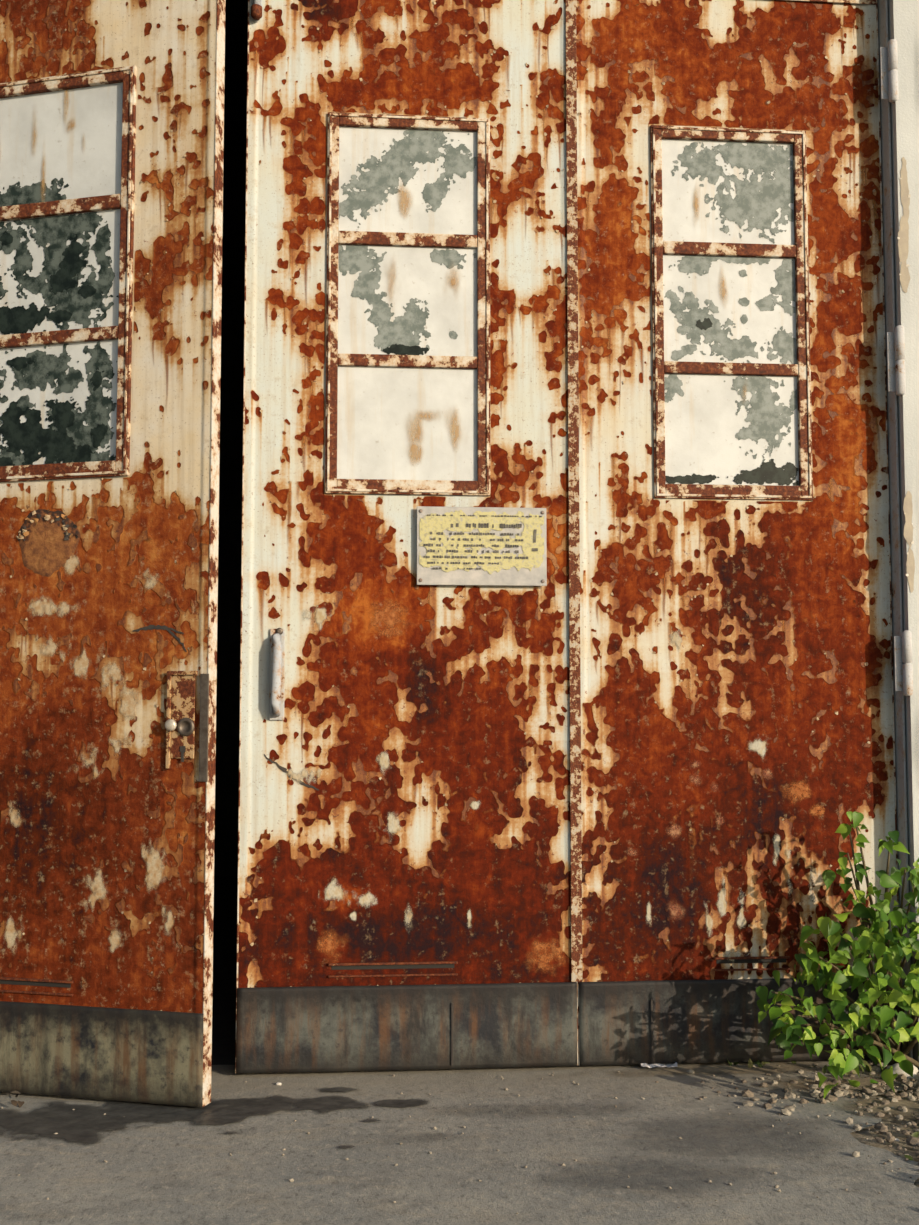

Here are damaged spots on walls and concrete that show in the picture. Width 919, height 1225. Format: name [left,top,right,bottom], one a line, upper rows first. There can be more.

damp [0,1087,428,1144]